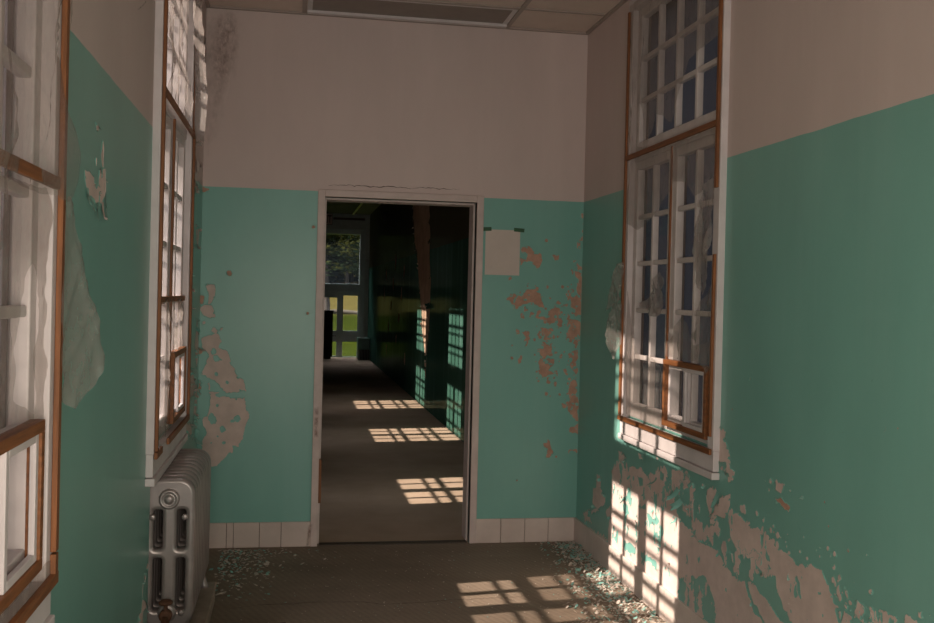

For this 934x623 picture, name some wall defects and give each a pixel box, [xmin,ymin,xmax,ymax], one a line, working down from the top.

peeling [84,122,109,220]
peeling [520,245,560,270]
peeling [192,283,250,467]
peeling [506,260,582,435]
peeling [535,540,667,623]
peeling [583,426,931,623]